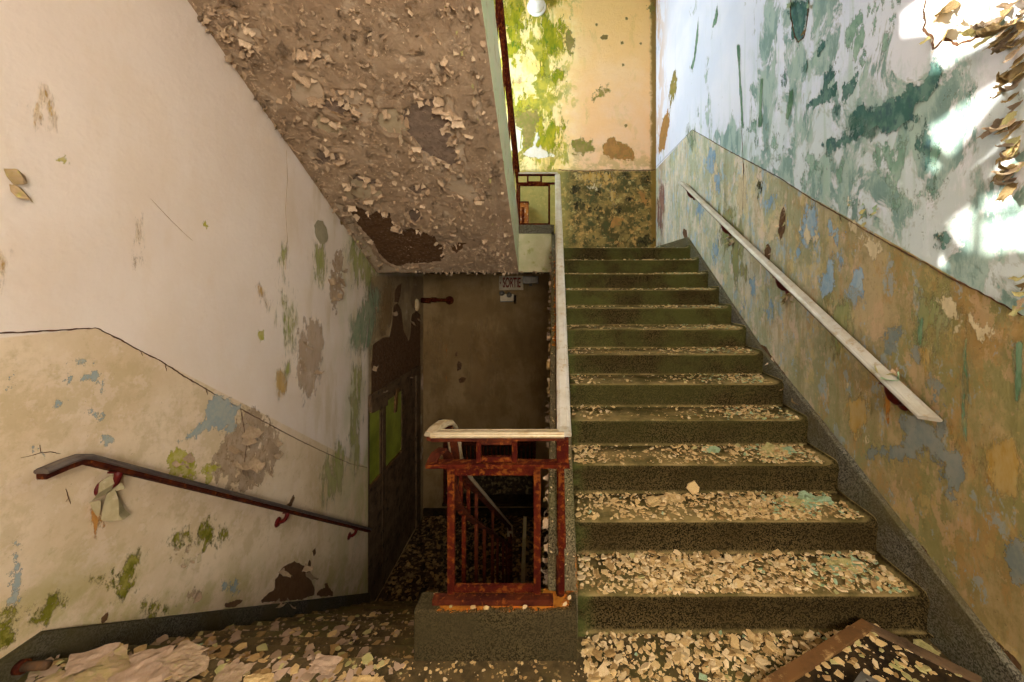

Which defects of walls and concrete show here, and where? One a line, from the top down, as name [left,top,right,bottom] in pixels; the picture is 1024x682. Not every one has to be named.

flaking render [786,0,812,48]
flaking render [571,137,635,161]
peeling [919,0,1024,202]
flaking render [197,0,555,448]
peeling [757,171,883,309]
peeling [933,231,951,250]
peeling [933,294,995,344]
peeling [166,394,284,492]
peeling [863,345,966,505]
peeling [541,469,549,586]
flaking render [258,548,334,609]
corrosion [436,556,578,613]